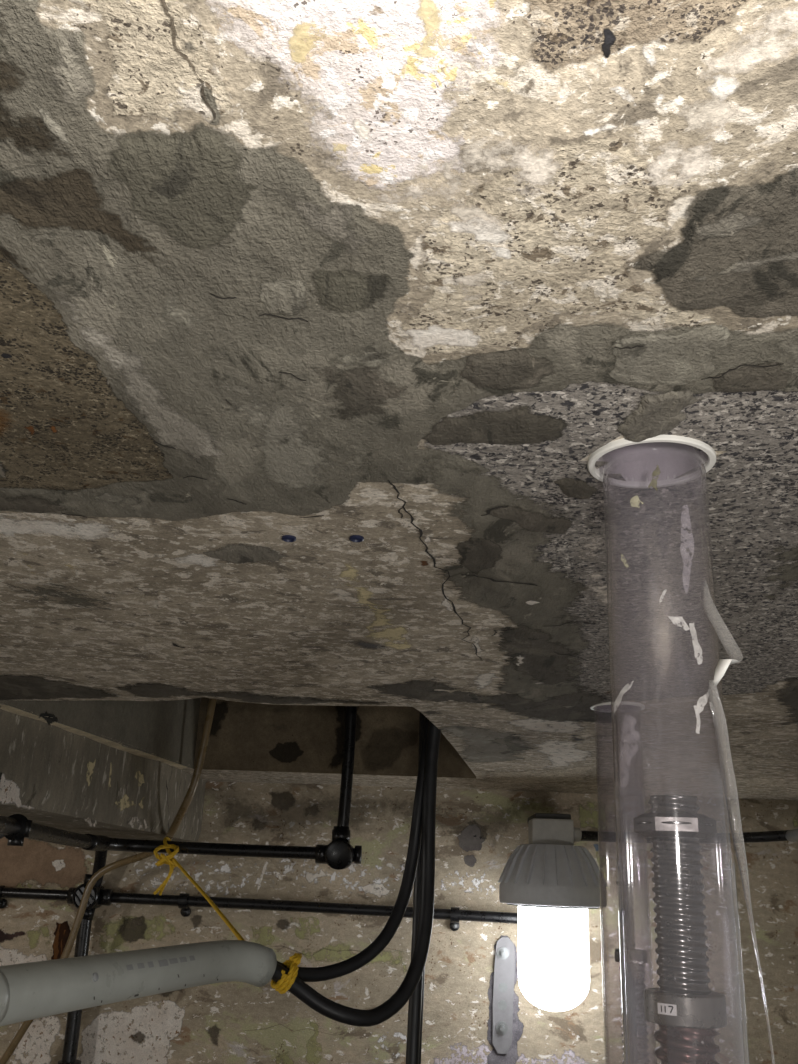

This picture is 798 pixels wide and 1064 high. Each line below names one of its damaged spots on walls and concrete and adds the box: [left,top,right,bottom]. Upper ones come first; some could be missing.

crack [161,0,216,119]
spalling [0,250,173,491]
crack [388,480,537,659]
spalling [424,381,798,702]